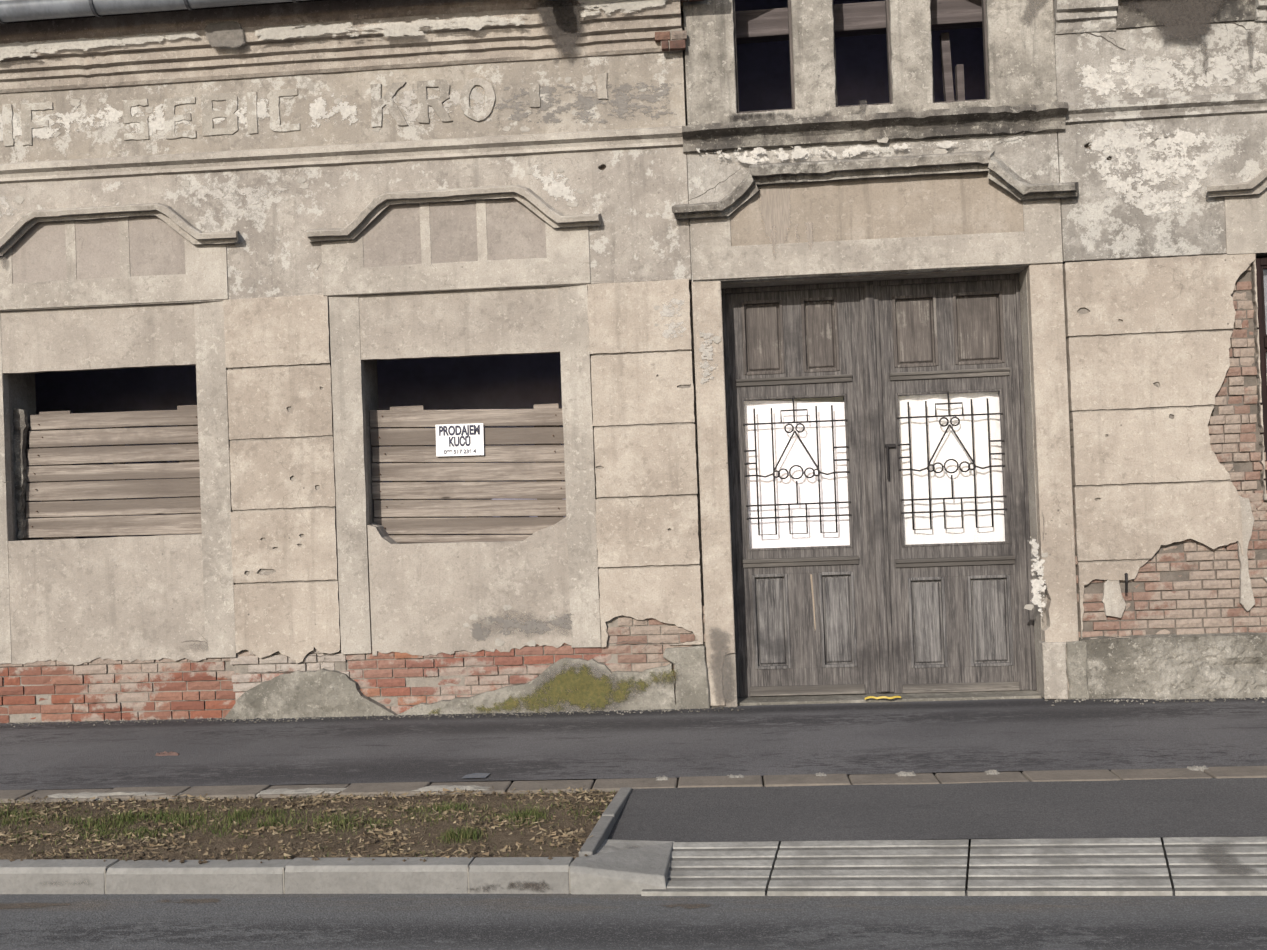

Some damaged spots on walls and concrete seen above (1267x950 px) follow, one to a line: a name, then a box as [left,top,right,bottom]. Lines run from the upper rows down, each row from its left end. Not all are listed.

leakage [536,0,582,54]
leakage [1122,0,1224,41]
peeling [1074,50,1267,97]
peeling [0,99,192,143]
peeling [213,94,293,136]
peeling [309,94,359,128]
peeling [696,137,911,165]
peeling [933,140,965,154]
peeling [1077,121,1227,217]
flaking render [1075,264,1267,637]
flaking render [0,605,706,723]